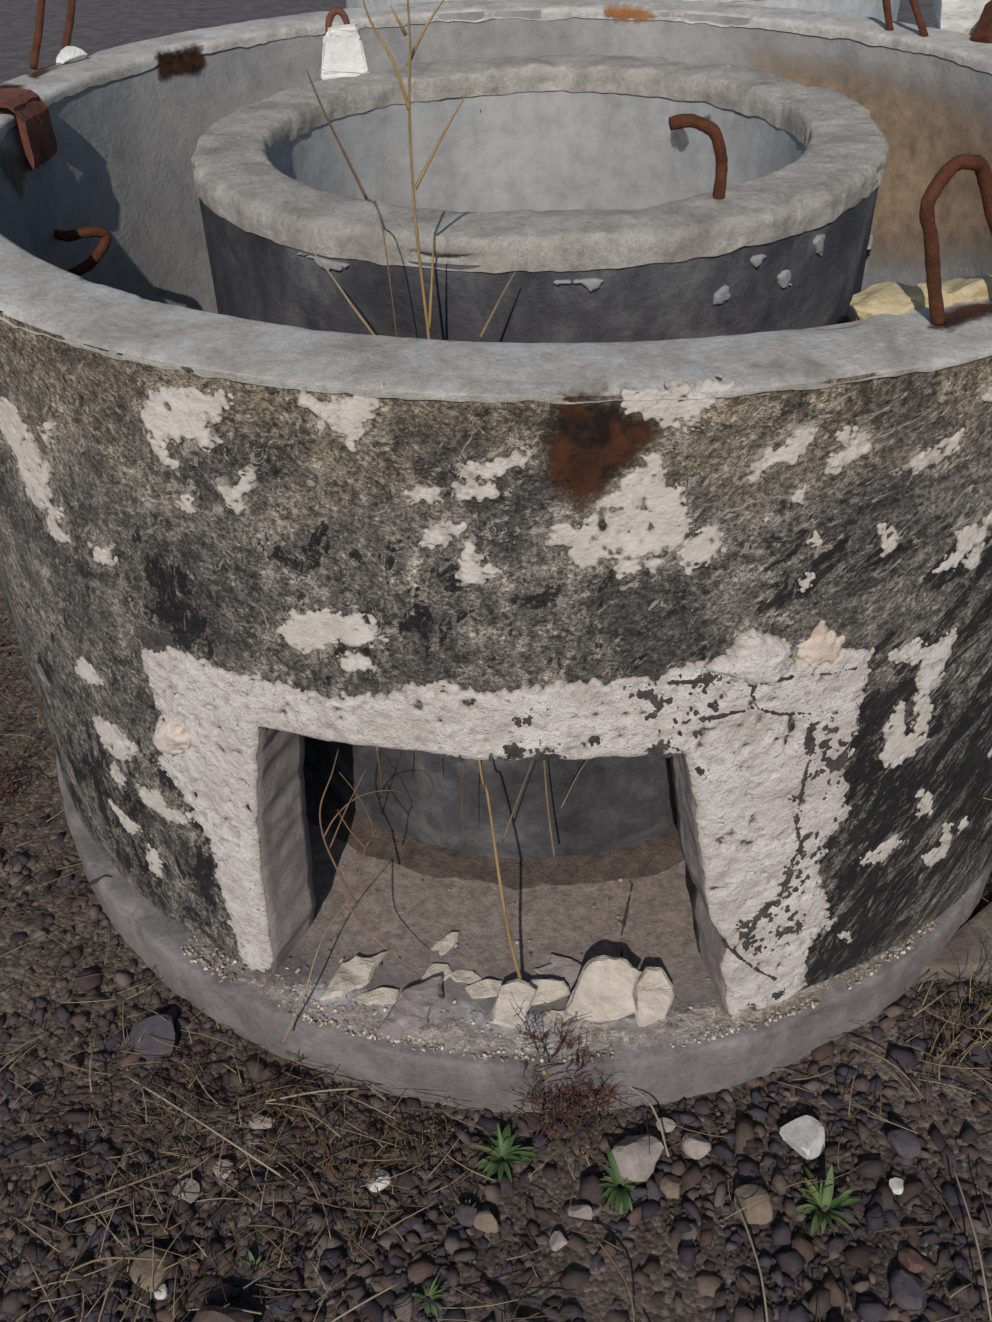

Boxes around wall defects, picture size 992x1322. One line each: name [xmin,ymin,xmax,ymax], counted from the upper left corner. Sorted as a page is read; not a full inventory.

rust [605,5,653,22]
rust [156,45,205,80]
rust [929,300,992,329]
peeling [0,397,71,546]
rust [545,392,660,509]
peeling [545,452,728,580]
peeling [276,608,389,673]
crack [502,745,583,762]
crack [647,744,684,753]
crack [667,667,857,896]
spalling [92,628,958,1052]
crack [723,941,777,981]